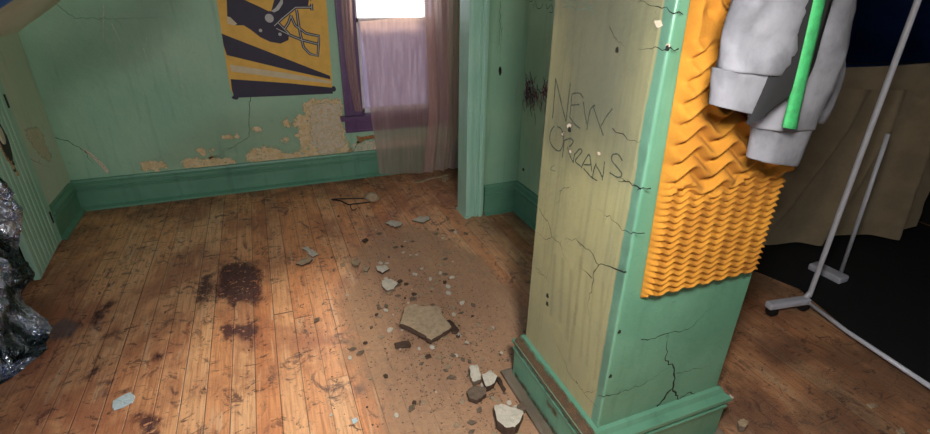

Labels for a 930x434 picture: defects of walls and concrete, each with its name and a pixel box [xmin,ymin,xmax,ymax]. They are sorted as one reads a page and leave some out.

peeling [139,159,168,172]
peeling [180,97,426,169]
crack [536,187,627,298]
leakage [197,262,263,307]
leakage [220,322,258,340]
crack [556,307,714,407]